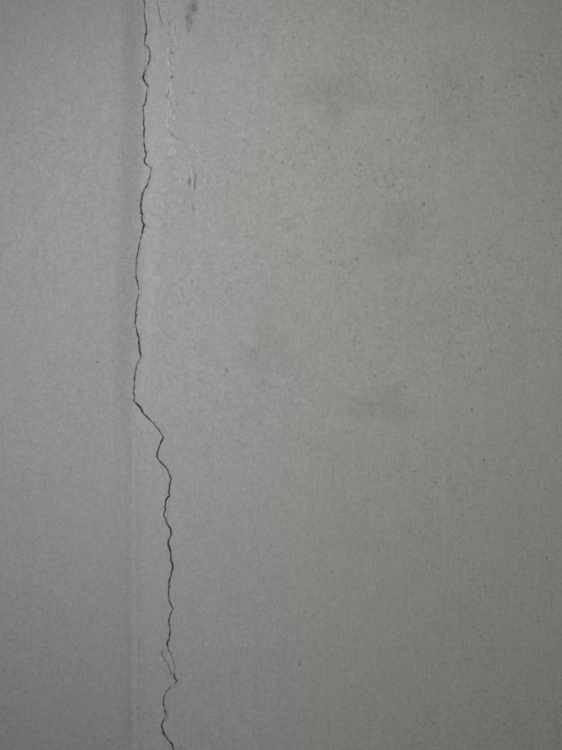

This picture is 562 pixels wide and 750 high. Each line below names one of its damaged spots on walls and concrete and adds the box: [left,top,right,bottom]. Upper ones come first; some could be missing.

crack [133,0,179,750]